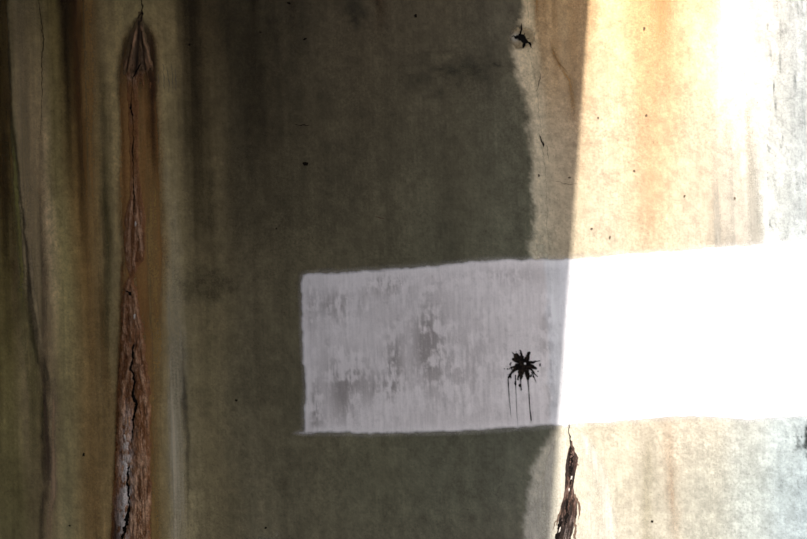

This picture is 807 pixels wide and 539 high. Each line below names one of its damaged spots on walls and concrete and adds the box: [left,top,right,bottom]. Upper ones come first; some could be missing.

damp [0,0,38,368]
damp [41,378,57,525]
corrosion [113,318,122,493]
corrosion [119,21,163,539]